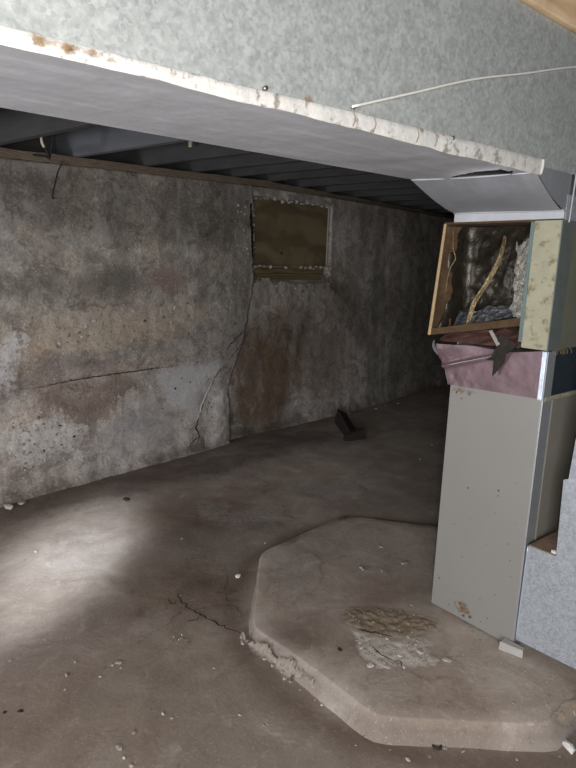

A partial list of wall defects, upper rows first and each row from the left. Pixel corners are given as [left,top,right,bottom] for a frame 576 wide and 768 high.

crack [10,365,179,392]
crack [188,316,248,450]
crack [168,589,248,637]
spalling [240,632,318,685]
spalling [338,606,443,669]